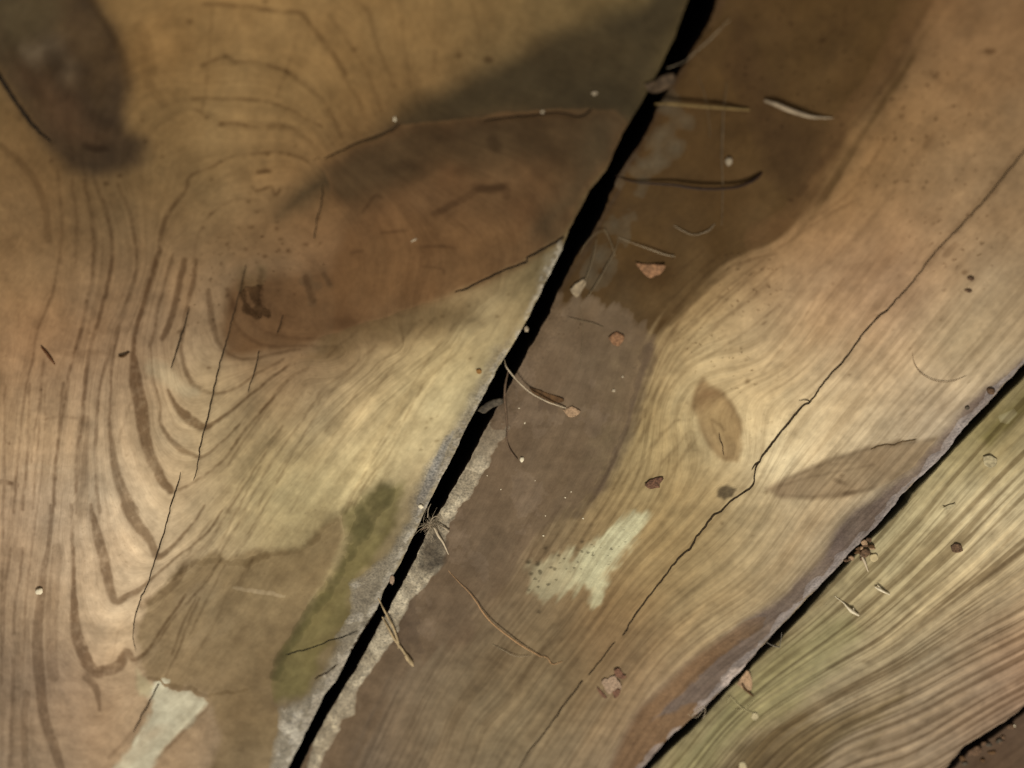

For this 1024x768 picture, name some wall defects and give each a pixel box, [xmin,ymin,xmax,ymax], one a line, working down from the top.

crack [133,266,246,651]
leakage [109,240,564,768]
crack [325,124,400,159]
leakage [264,0,939,768]
crack [519,152,1024,768]